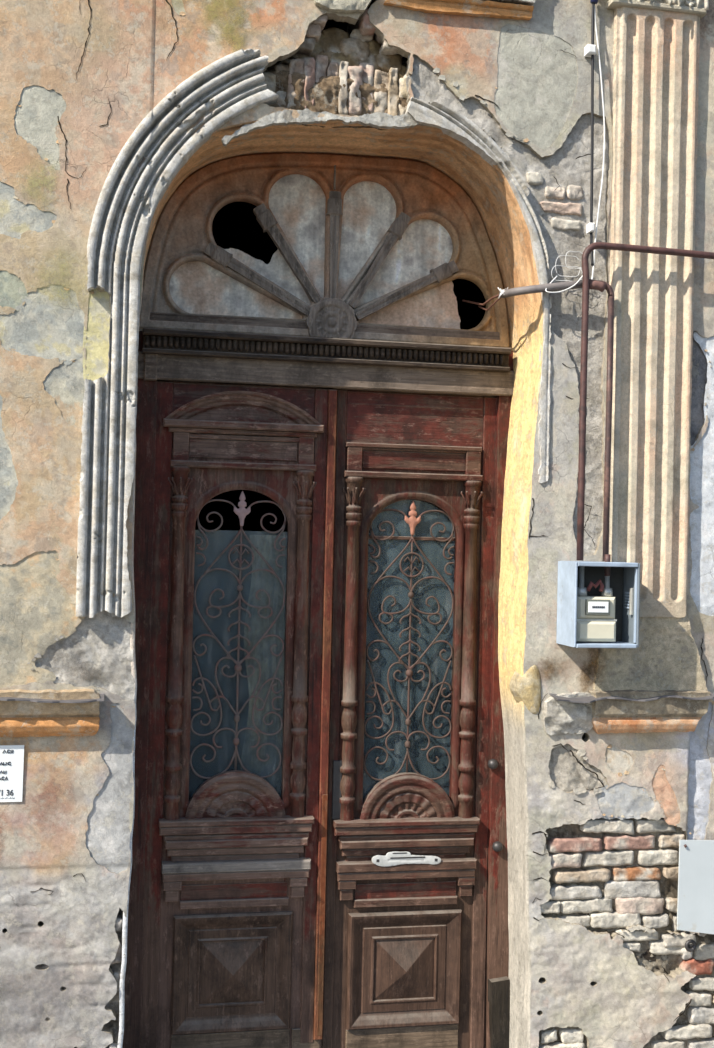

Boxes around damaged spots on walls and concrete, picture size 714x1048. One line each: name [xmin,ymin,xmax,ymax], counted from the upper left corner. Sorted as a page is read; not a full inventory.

crack [76,0,92,79]
crack [165,0,178,59]
peeling [14,85,66,170]
peeling [0,182,57,239]
spalling [263,0,609,556]
peeling [0,271,111,425]
peeling [0,395,18,520]
peeling [689,331,714,616]
spalling [538,699,714,1048]